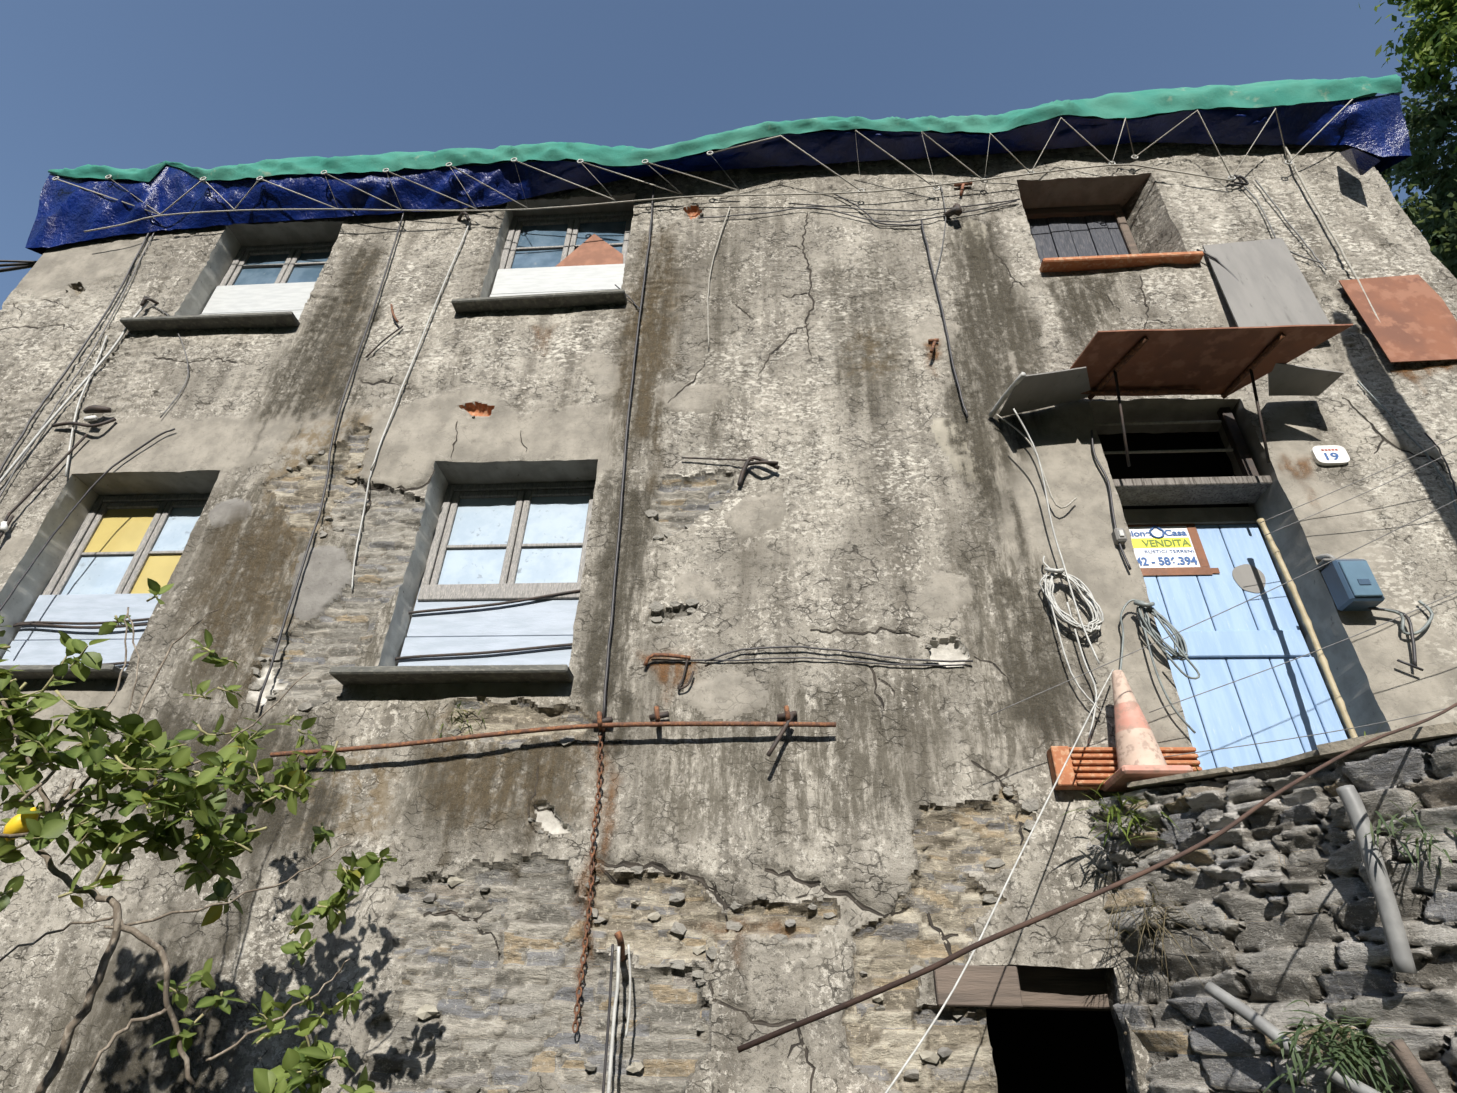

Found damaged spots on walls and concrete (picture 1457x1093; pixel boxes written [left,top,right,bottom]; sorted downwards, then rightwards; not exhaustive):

damp [196,517,293,698]
damp [262,247,381,476]
spalling [246,422,425,711]
spalling [459,402,495,418]
damp [581,231,676,756]
spalling [644,469,736,541]
crack [757,211,815,381]
damp [946,223,1039,556]
spalling [363,783,1039,1093]